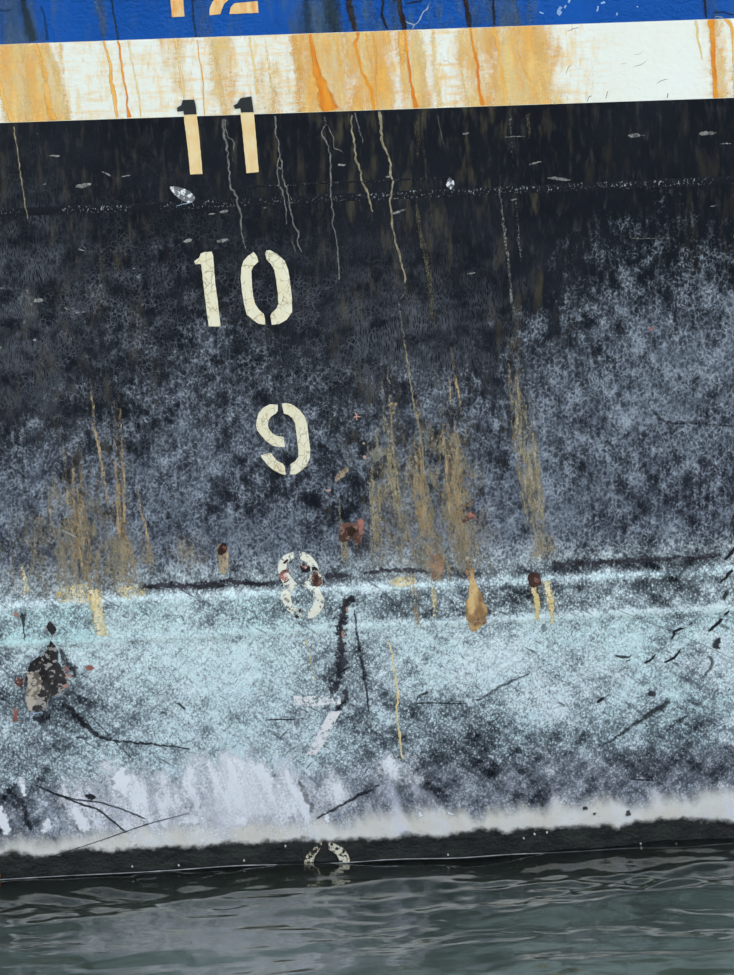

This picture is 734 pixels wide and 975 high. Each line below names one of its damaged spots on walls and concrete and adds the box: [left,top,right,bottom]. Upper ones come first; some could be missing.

corrosion [0,43,69,122]
corrosion [415,204,433,319]
corrosion [21,423,154,637]
corrosion [339,399,491,631]
corrosion [508,365,555,558]
corrosion [527,572,557,624]
peeling [12,621,95,725]